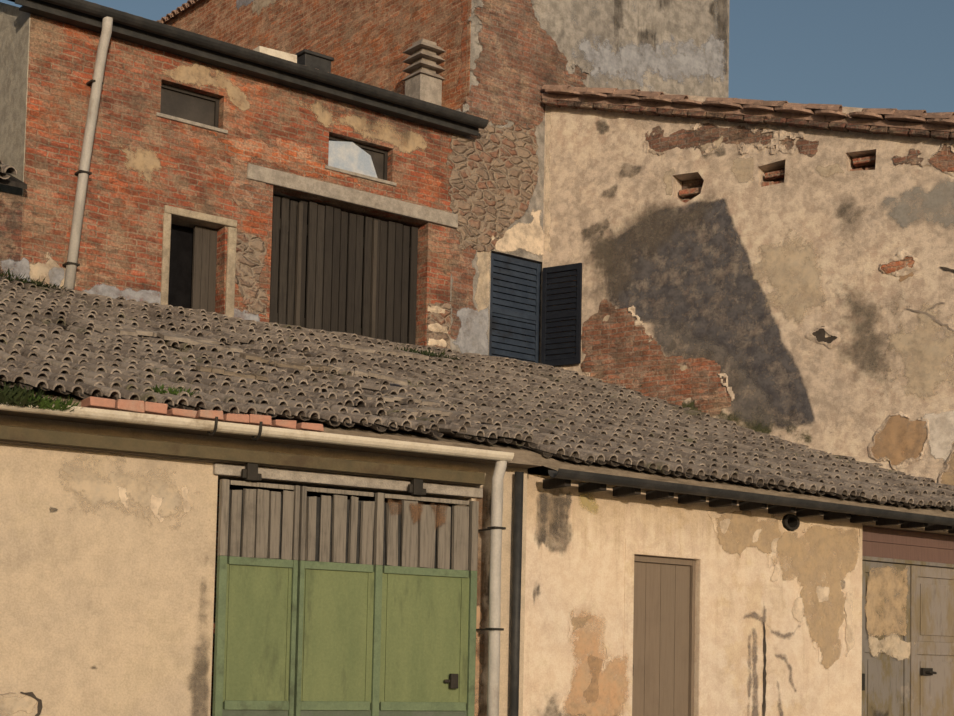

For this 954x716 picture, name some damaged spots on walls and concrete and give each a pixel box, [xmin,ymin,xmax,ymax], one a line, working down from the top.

flaking render [455,0,590,128]
flaking render [643,118,844,183]
flaking render [582,220,609,237]
spalling [878,249,920,282]
spalling [581,299,735,416]
flaking render [804,296,883,372]
spalling [867,411,930,470]
spalling [937,444,954,486]
leakage [538,493,598,550]
peeling [706,506,862,669]
peeling [865,567,915,661]
peeling [560,615,628,716]